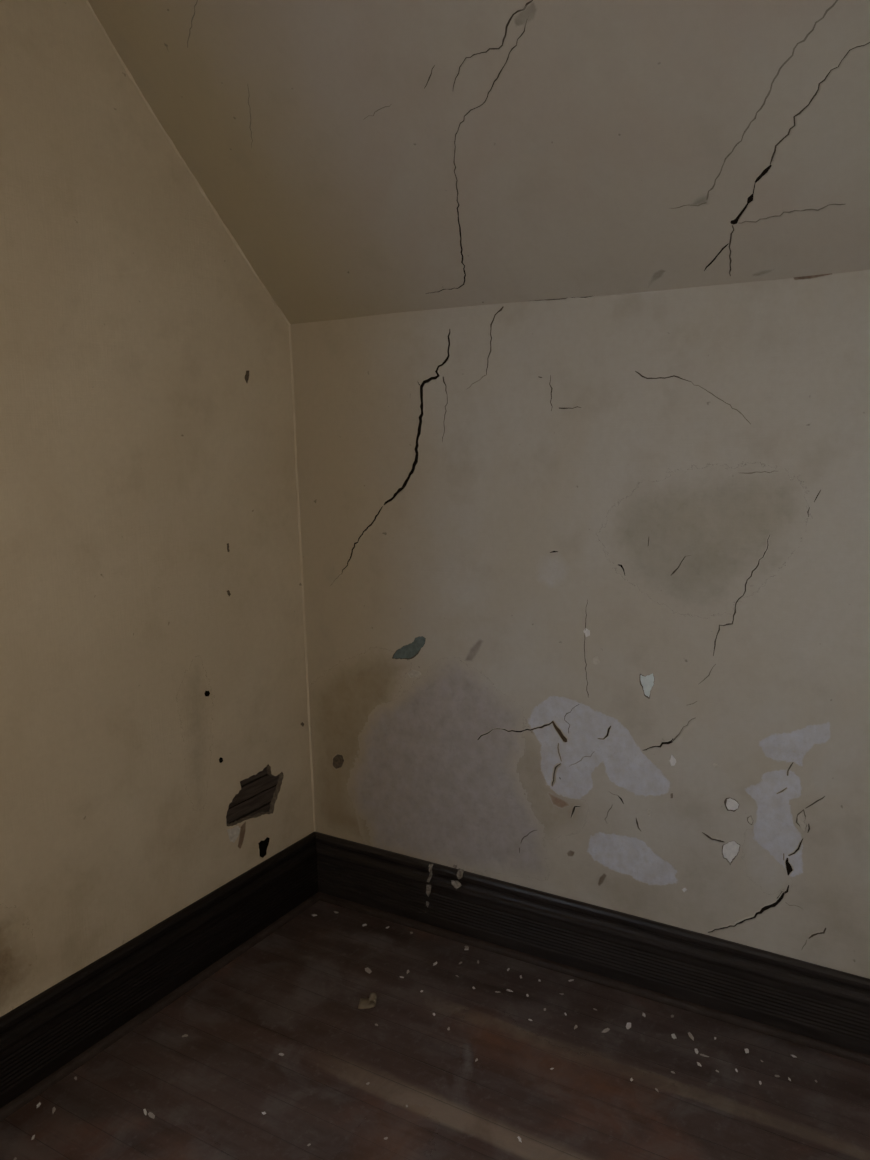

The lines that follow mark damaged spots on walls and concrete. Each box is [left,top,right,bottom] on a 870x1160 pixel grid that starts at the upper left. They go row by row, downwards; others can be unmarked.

crack [424,0,535,294]
crack [672,0,838,209]
crack [703,40,870,276]
crack [330,293,627,586]
spalling [392,636,426,660]
crack [642,534,771,752]
leakage [0,903,38,1017]
spalling [226,764,284,843]
peeling [332,657,677,881]
peeling [586,832,687,892]
crack [707,762,828,949]
peeling [722,721,832,896]